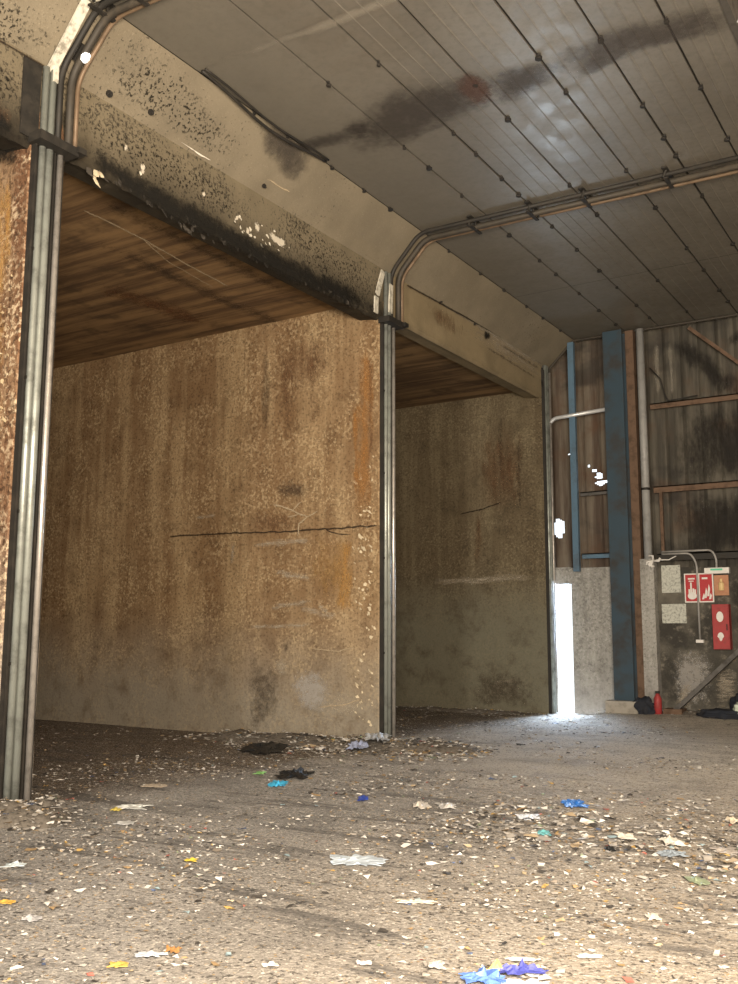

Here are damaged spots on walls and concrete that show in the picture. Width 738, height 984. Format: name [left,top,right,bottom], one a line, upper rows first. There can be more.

leakage [0,0,24,43]
leakage [587,15,701,69]
leakage [499,67,542,94]
leakage [114,67,234,152]
leakage [269,90,470,172]
spalling [86,167,132,192]
leakage [84,113,245,214]
spalling [234,215,290,251]
crack [170,502,377,537]